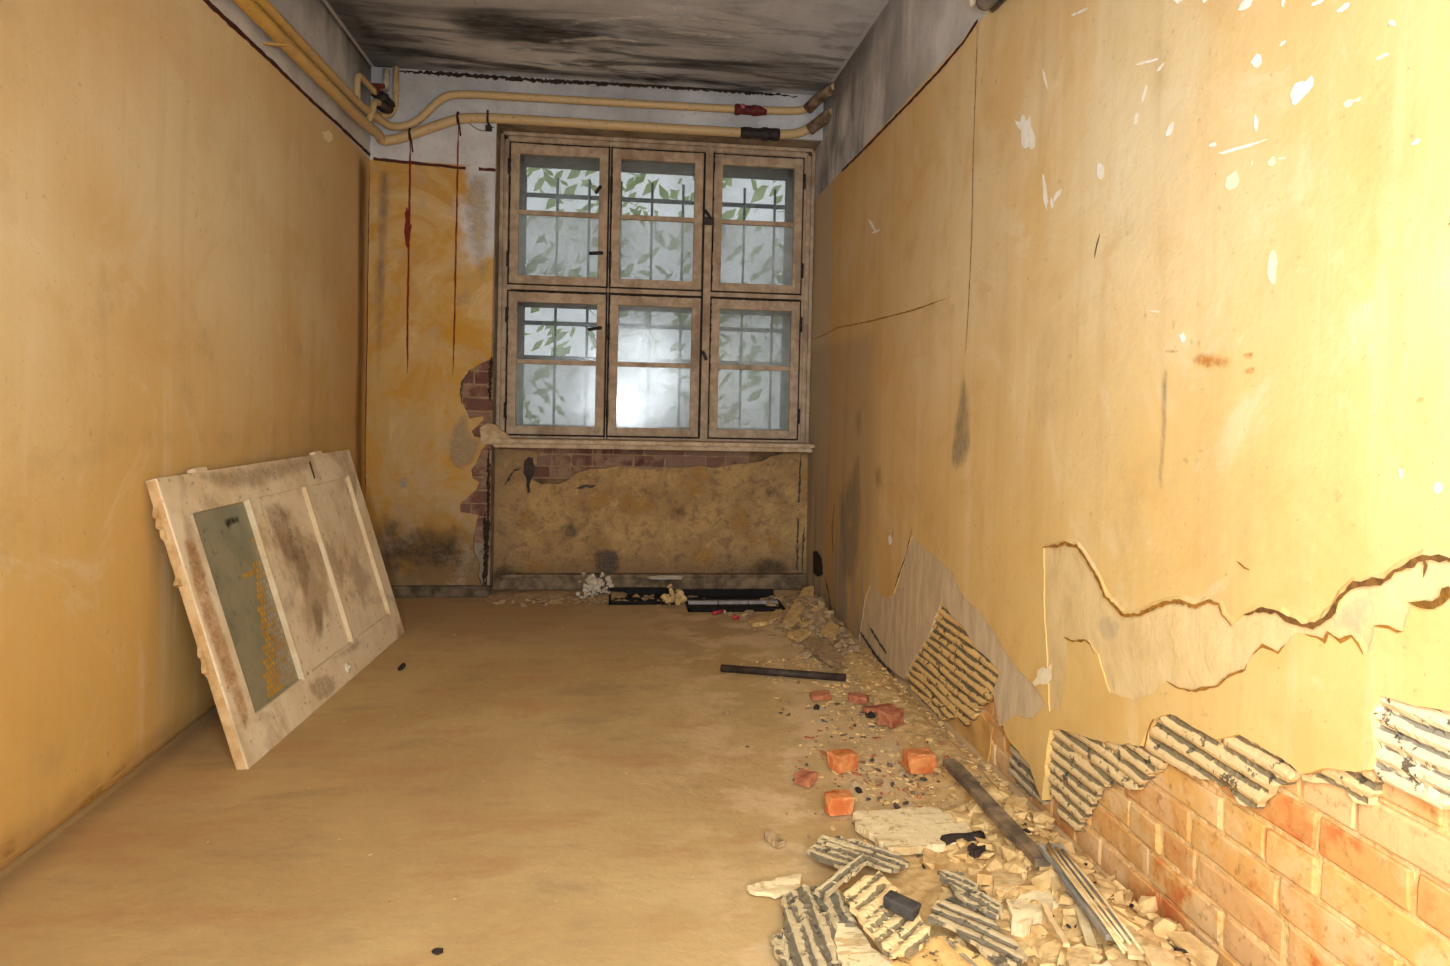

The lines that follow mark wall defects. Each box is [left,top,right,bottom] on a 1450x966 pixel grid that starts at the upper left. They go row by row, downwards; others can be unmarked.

peeling [1238,0,1253,11]
peeling [1311,0,1350,13]
peeling [1250,54,1262,68]
peeling [1290,76,1314,105]
peeling [1015,114,1035,150]
peeling [1209,115,1286,190]
peeling [1042,174,1062,210]
rust [404,142,412,374]
peeling [1267,250,1277,284]
flaking render [523,457,535,493]
crack [1042,538,1450,692]
flaking render [860,535,1450,966]